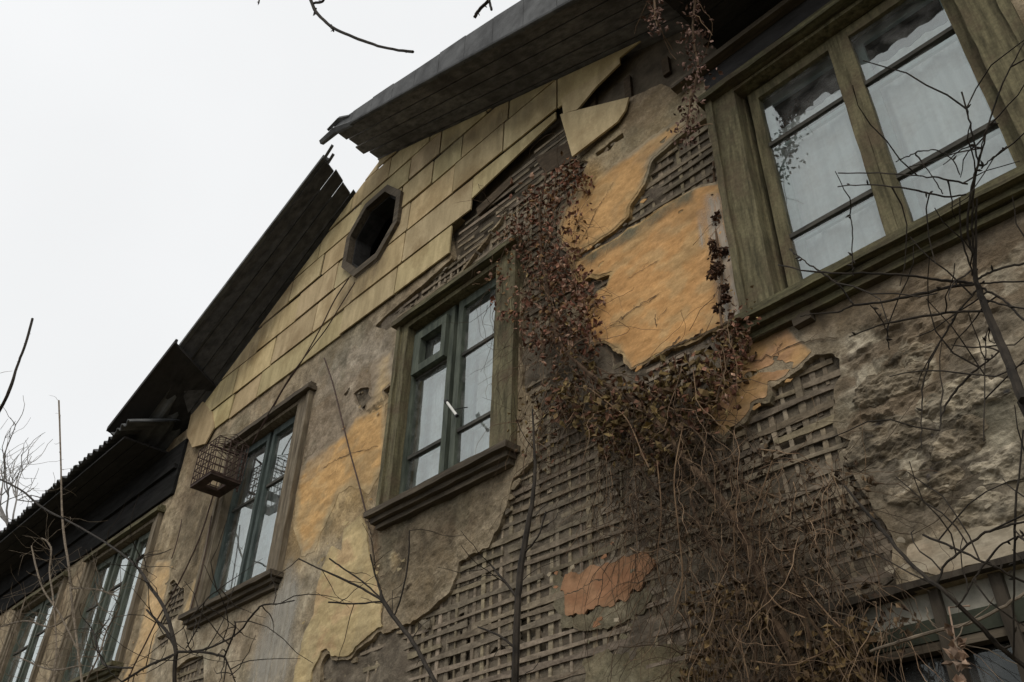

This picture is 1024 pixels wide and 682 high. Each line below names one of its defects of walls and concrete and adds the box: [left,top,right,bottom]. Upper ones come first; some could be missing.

spalling [293,118,1024,682]
crack [610,294,728,367]